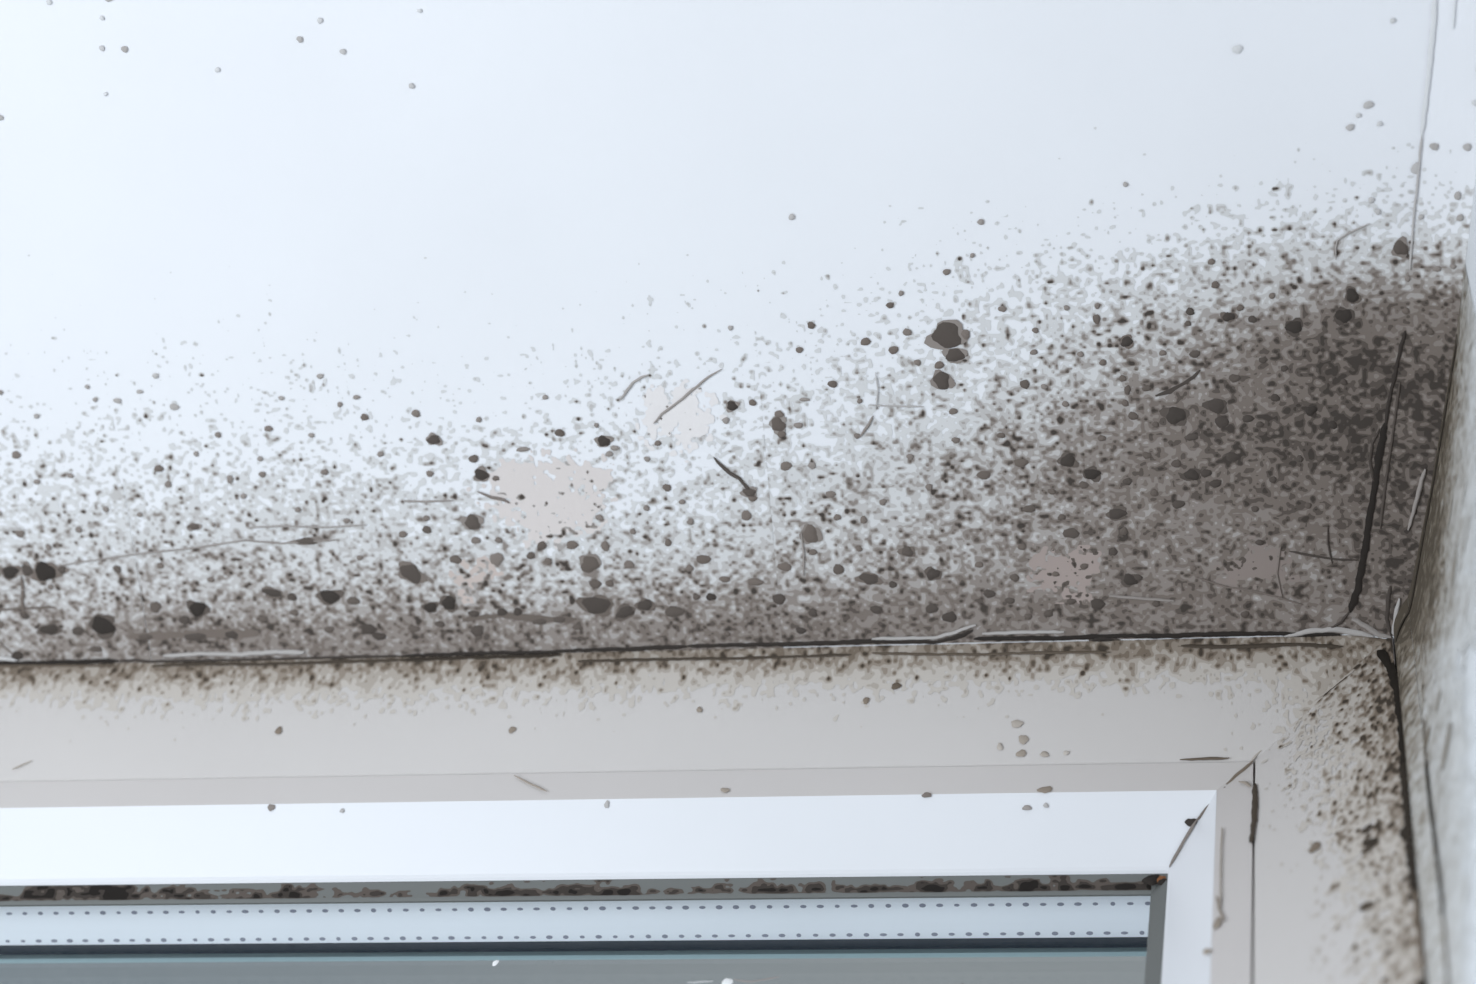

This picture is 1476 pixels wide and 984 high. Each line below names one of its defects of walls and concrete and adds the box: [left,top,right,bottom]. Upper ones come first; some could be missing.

water stain [282,353,329,400]
water stain [563,347,610,387]
water stain [638,340,702,408]
water stain [0,390,51,419]